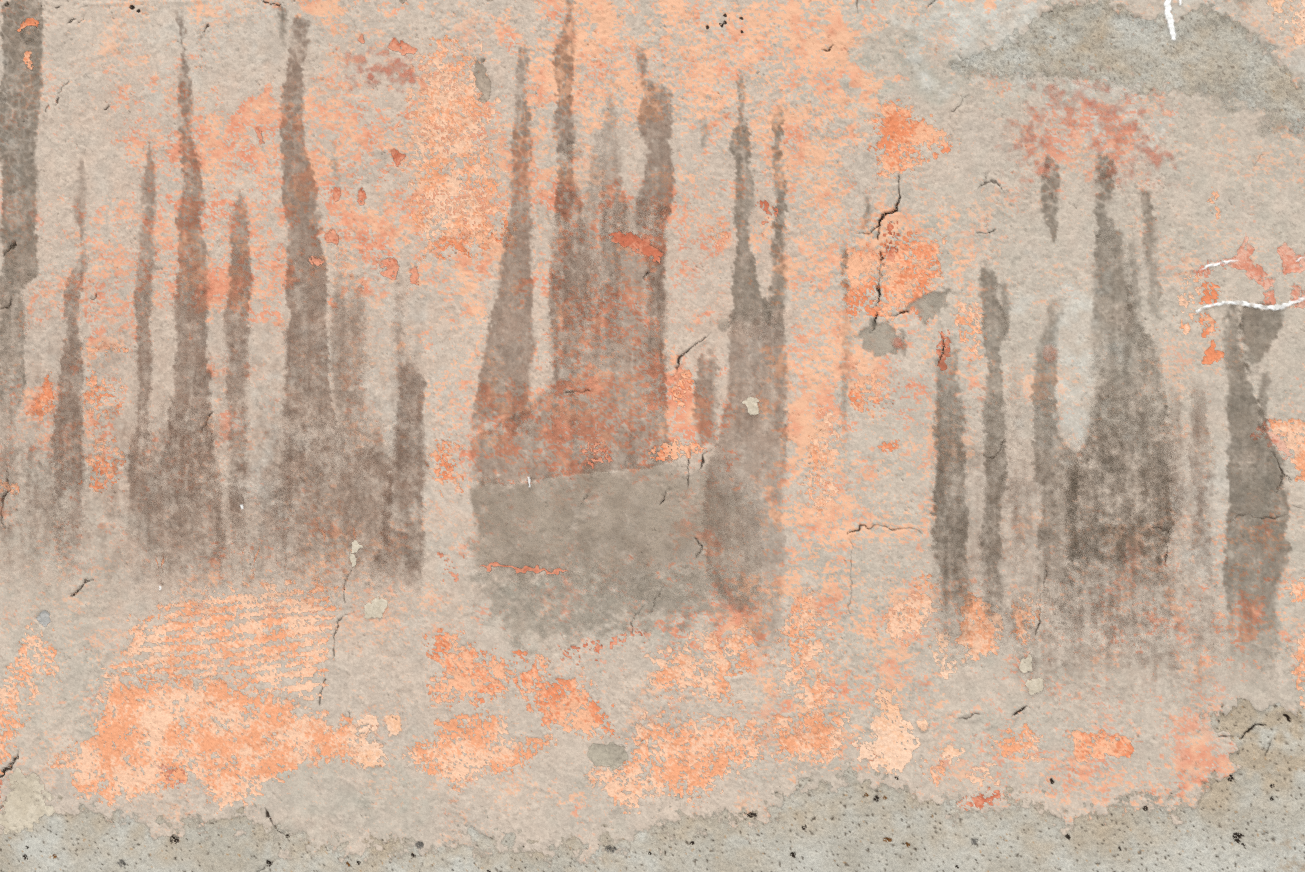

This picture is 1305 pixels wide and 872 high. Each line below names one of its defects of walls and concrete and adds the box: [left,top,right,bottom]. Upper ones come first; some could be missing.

peeling [379,35,518,285]
peeling [864,97,960,179]
peeling [357,187,367,205]
peeling [756,190,778,236]
peeling [325,229,339,245]
peeling [608,231,663,263]
crack [874,193,905,322]
peeling [840,221,987,418]
peeling [742,397,759,415]
peeling [648,438,704,461]
peeling [878,439,900,452]
peeling [0,574,1305,872]